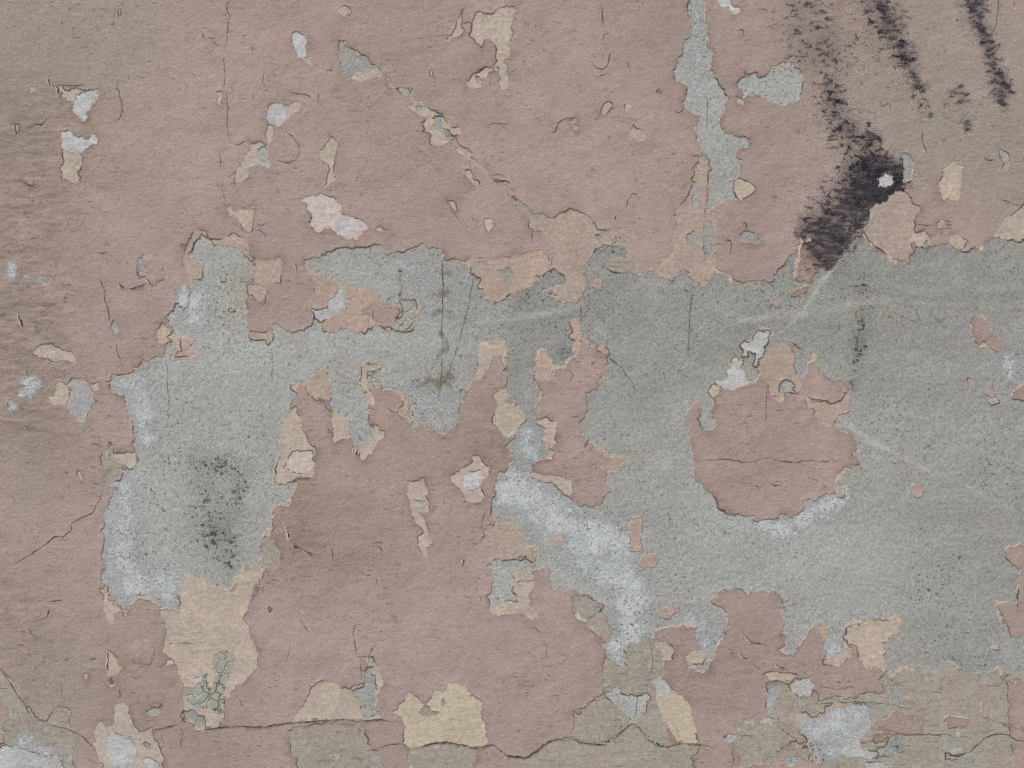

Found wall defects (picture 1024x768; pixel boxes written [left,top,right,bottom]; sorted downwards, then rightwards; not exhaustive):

water stain [980,38,1014,106]
water stain [798,91,911,270]
spalling [106,0,1024,683]
crack [13,484,103,565]
peeling [160,568,265,732]
water stain [184,449,249,575]
water stain [492,425,658,666]
peeling [486,469,699,748]
crack [710,450,833,488]
crack [115,697,734,768]
peeling [392,682,490,768]
peeling [723,660,1024,768]